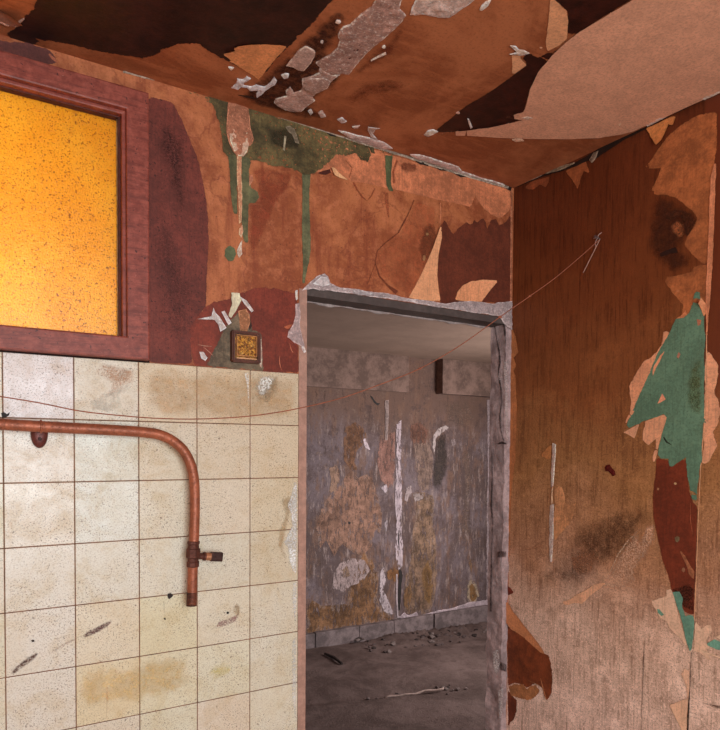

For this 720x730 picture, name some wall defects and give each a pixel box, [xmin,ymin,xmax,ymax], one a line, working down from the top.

peeling [555,0,629,42]
peeling [437,51,556,132]
peeling [7,0,513,353]
peeling [199,293,264,398]
peeling [624,292,720,505]